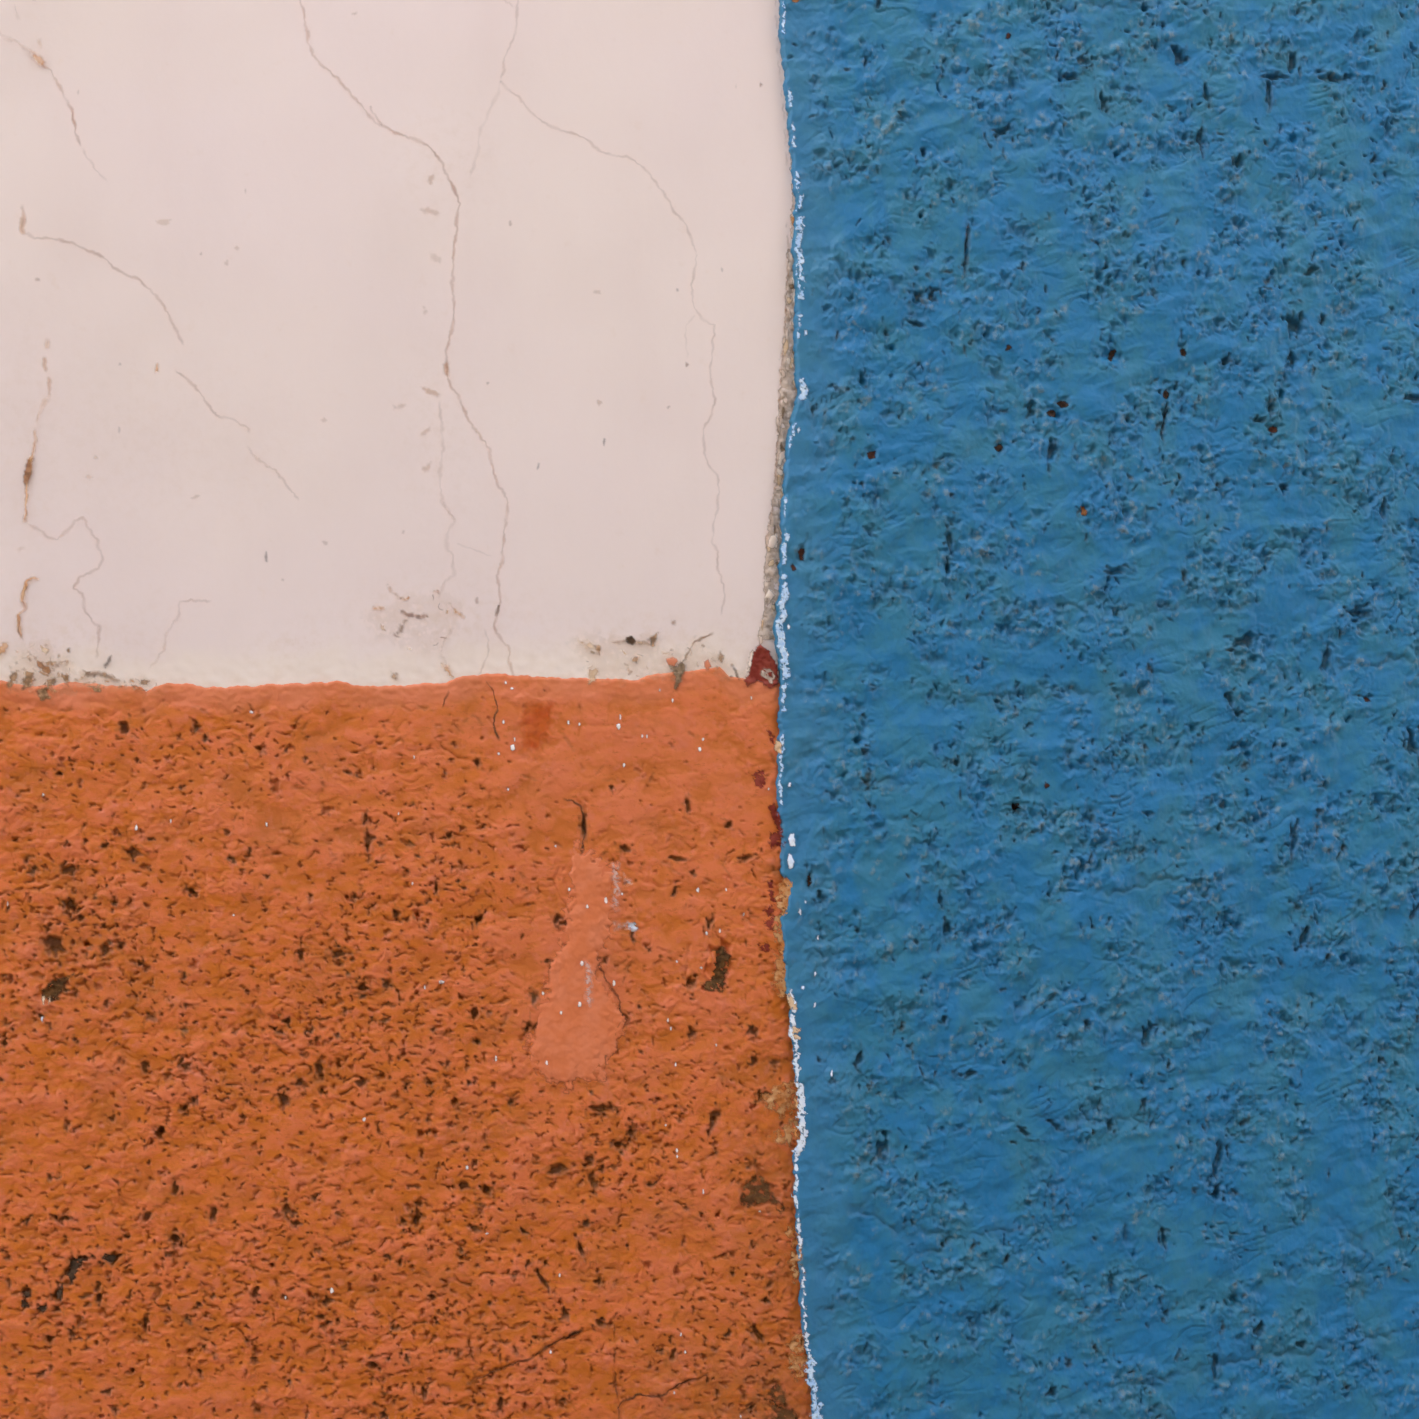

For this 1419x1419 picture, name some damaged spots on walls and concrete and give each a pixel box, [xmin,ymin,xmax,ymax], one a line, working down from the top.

flaking render [704,90,808,711]
flaking render [624,634,657,663]
flaking render [666,635,709,689]